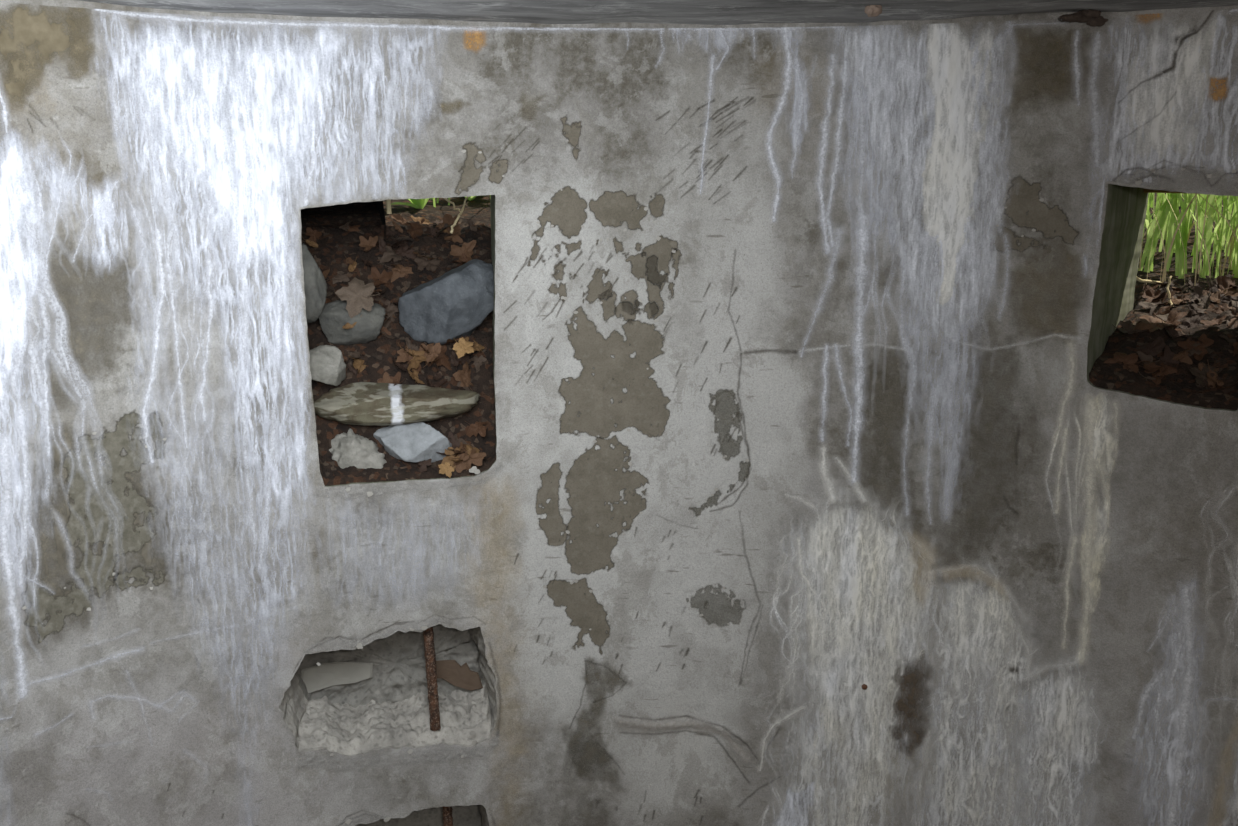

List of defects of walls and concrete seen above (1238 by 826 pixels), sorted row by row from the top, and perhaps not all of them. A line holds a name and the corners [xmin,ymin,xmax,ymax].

crack [1155,10,1214,77]
peeling [990,177,1078,253]
leakage [0,4,464,698]
peeling [514,186,681,673]
peeling [689,379,750,516]
leakage [759,15,1238,826]
spalling [308,639,368,666]
spalling [383,620,441,731]
spalling [442,806,453,826]